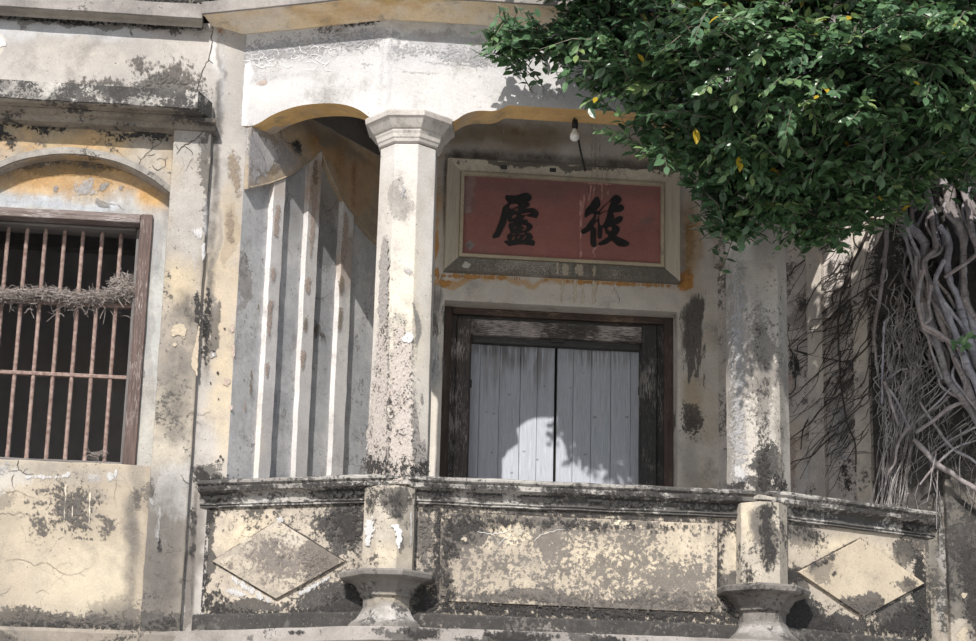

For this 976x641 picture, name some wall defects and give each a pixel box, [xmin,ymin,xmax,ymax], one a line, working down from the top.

leakage [65,54,213,96]
crack [197,26,213,89]
leakage [0,124,68,151]
peeling [224,211,234,243]
peeling [434,268,529,288]
peeling [191,299,234,376]
peeling [432,306,445,378]
leakage [24,469,118,541]
leakage [188,444,834,625]
leakage [956,523,976,639]
leakage [1,606,183,632]
leakage [396,627,440,639]